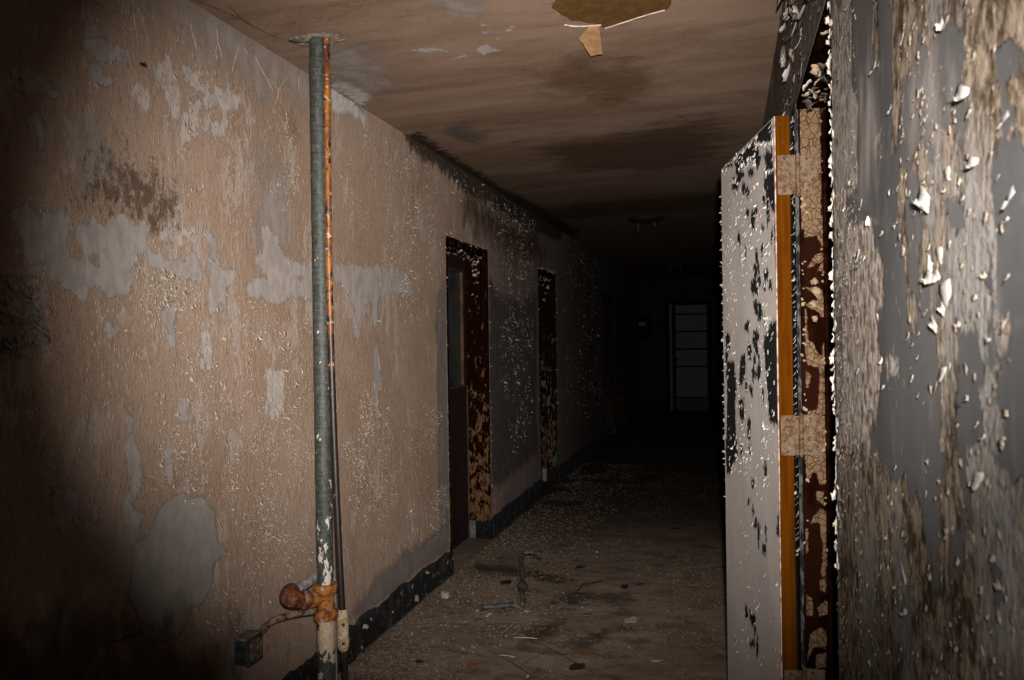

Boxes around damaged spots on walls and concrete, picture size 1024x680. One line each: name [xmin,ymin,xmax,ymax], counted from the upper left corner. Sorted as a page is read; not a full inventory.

peeling [7,55,314,642]
peeling [333,132,600,453]
spalling [552,0,671,56]
peeling [719,0,1024,680]